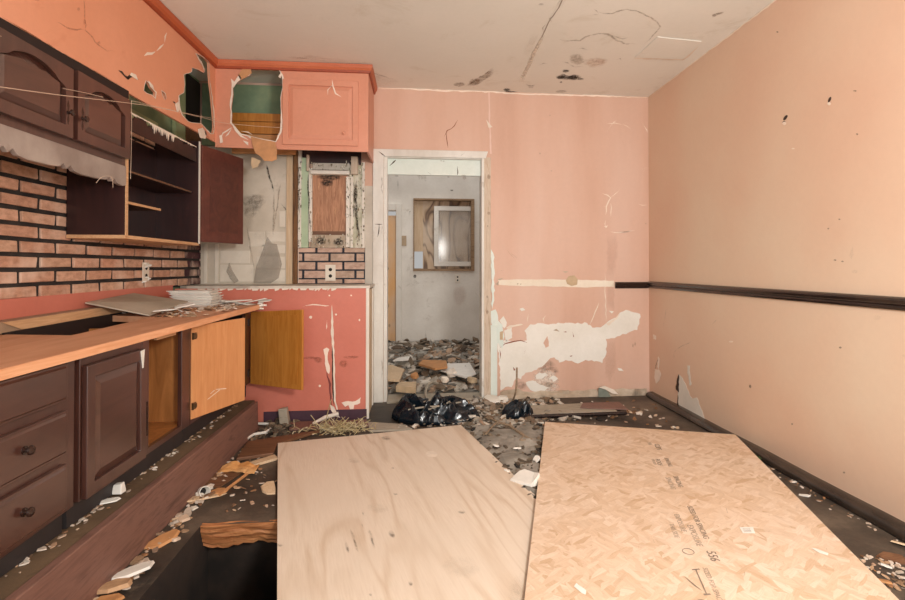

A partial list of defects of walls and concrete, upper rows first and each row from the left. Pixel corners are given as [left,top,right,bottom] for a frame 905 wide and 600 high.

crack [119,70,138,80]
peeling [231,69,252,88]
crack [523,0,563,76]
peeling [298,158,365,248]
flaking render [491,250,641,396]
peeling [676,365,705,419]